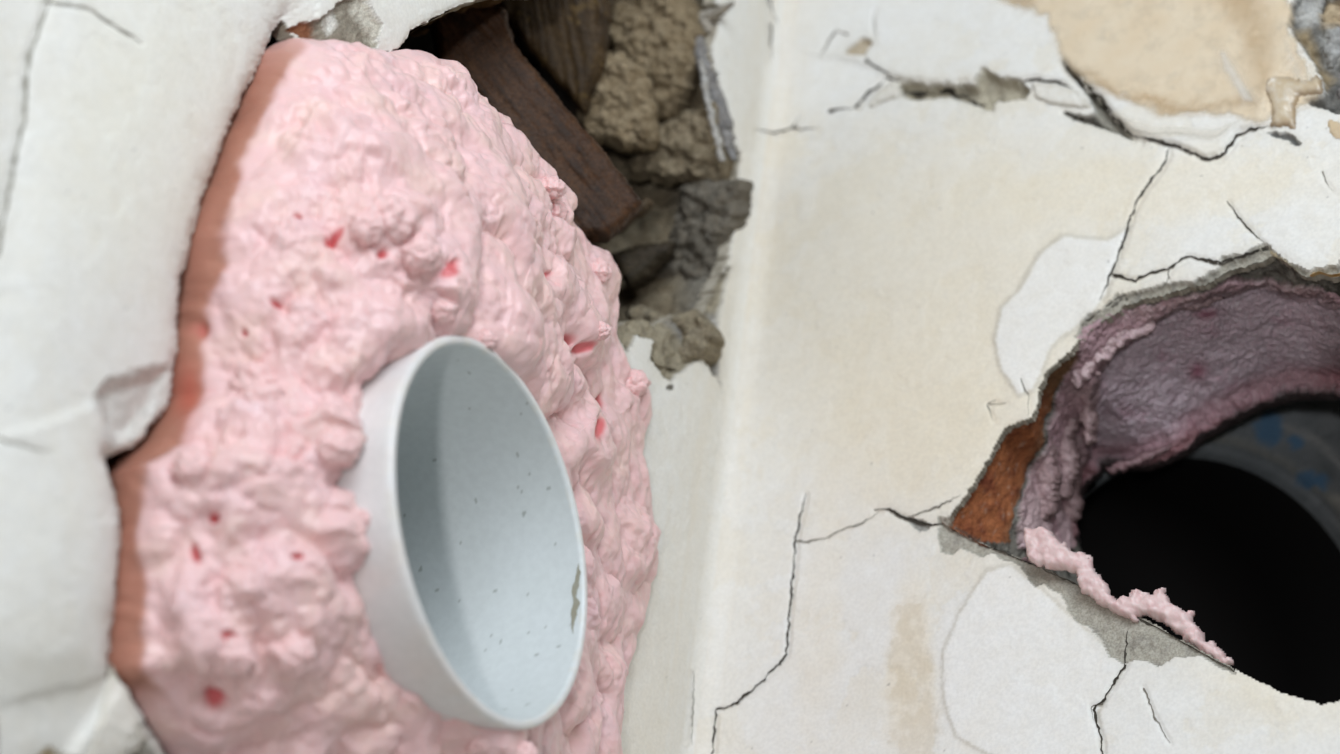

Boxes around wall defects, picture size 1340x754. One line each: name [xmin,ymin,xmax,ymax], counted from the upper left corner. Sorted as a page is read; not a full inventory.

flaking render [287,0,384,49]
spalling [396,0,503,56]
crack [760,12,986,134]
flaking render [869,66,1134,141]
leakage [1009,0,1317,137]
spalling [1266,0,1340,146]
crack [1024,61,1268,299]
peeling [617,266,733,387]
crack [987,378,1029,417]
peeling [908,243,1340,675]
crack [691,493,959,754]
crack [1091,631,1169,754]